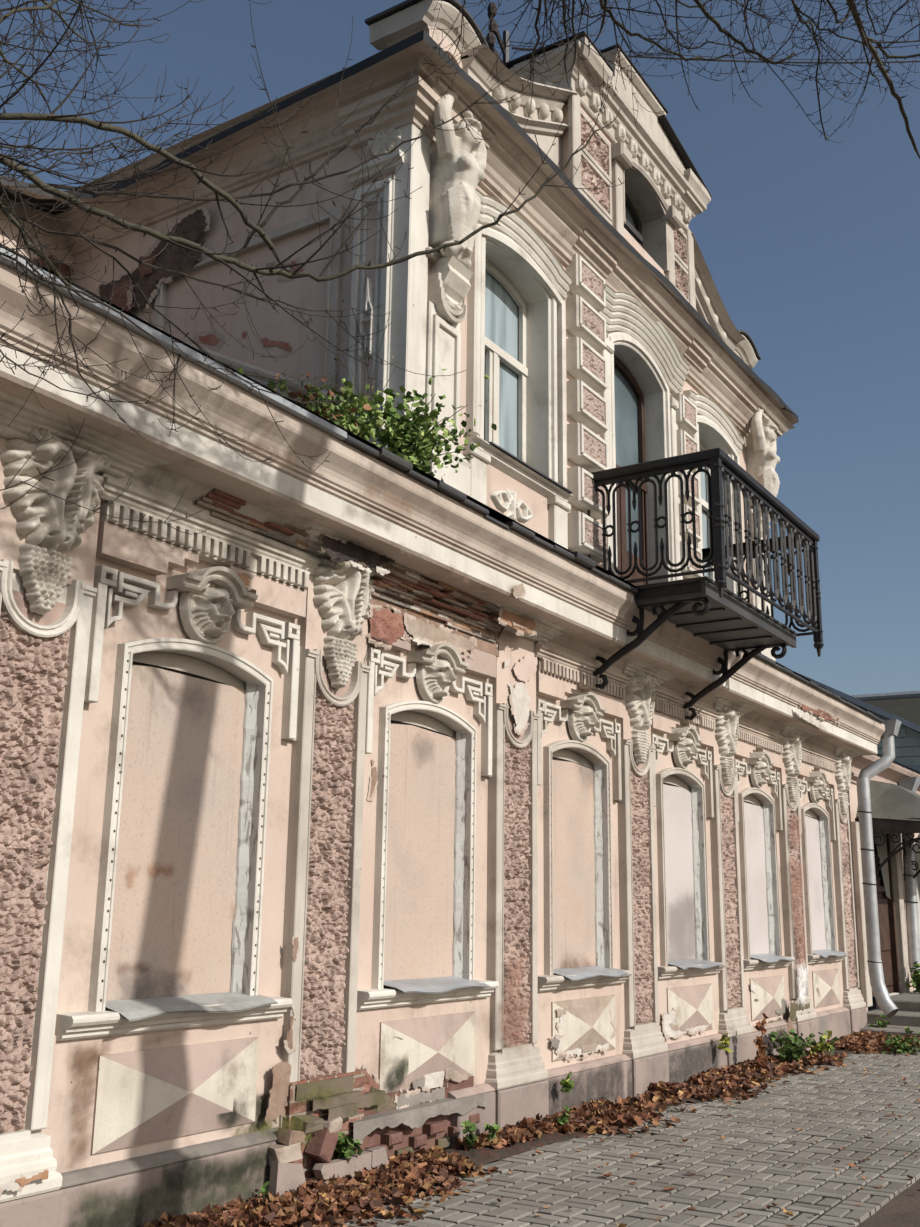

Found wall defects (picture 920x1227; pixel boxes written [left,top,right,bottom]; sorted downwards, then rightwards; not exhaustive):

spalling [96,207,210,312]
peeling [261,337,292,352]
spalling [193,488,537,658]
peeling [504,654,538,736]
spalling [351,1065,487,1156]